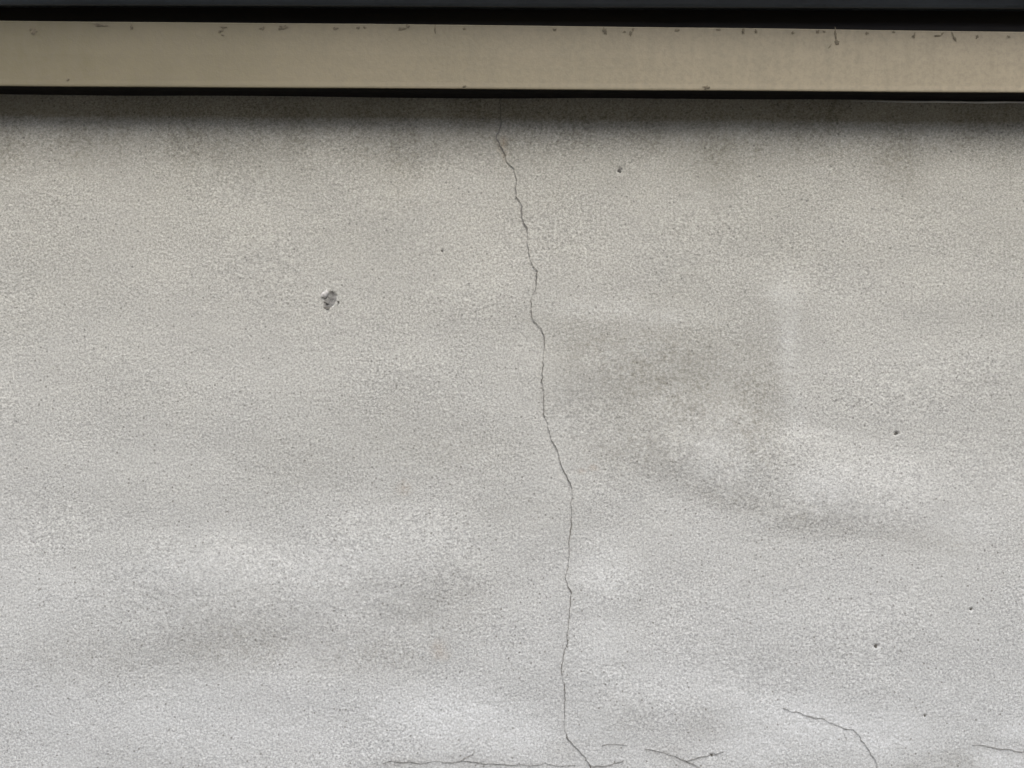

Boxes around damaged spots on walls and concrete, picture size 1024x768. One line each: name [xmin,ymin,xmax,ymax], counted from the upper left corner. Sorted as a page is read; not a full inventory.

crack [388,99,624,768]